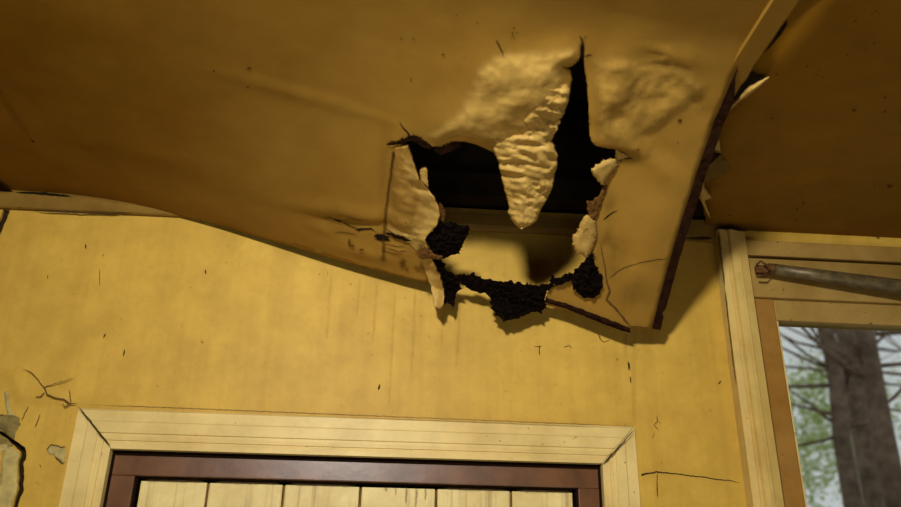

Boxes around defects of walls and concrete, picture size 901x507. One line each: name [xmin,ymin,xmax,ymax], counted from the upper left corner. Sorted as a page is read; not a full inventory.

crack [0,209,9,234]
peeling [386,145,445,310]
peeling [0,391,21,507]
crack [0,369,110,507]
peeling [47,444,66,464]
crack [641,471,740,498]